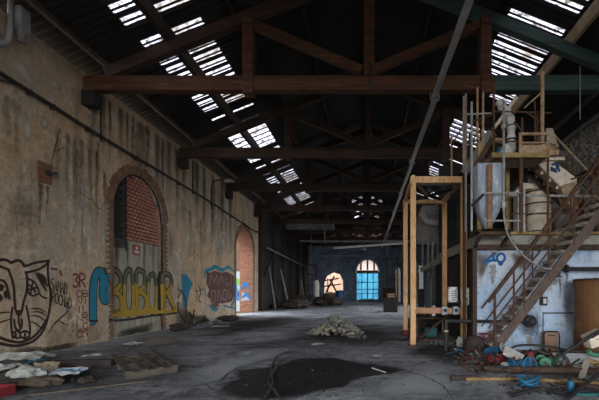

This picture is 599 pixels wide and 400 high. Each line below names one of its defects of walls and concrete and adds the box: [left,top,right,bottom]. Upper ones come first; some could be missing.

leakage [119,108,185,188]